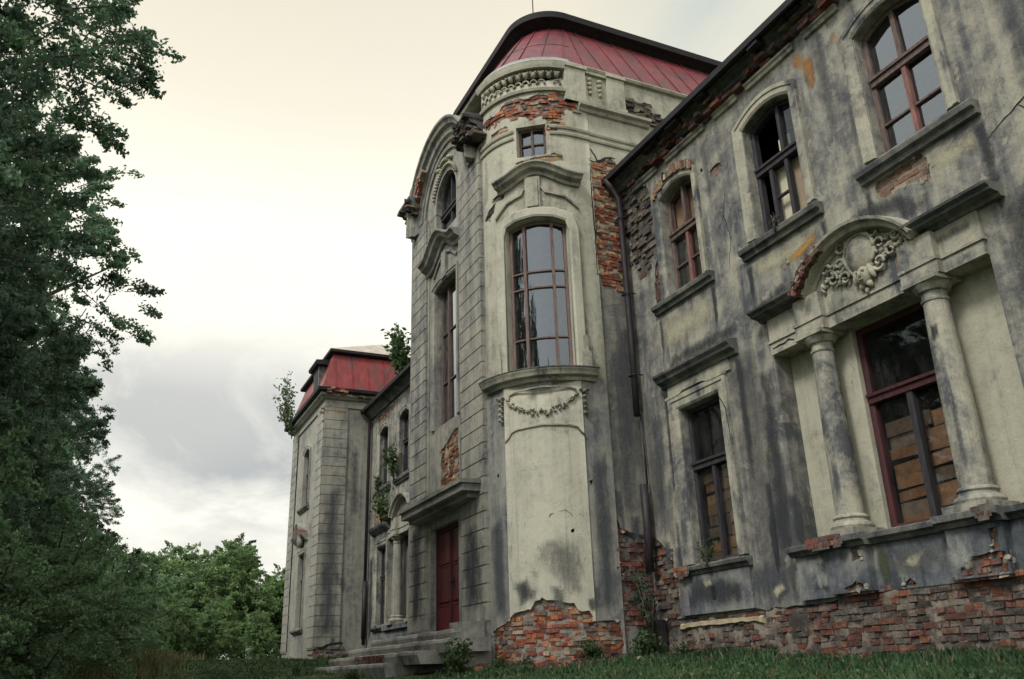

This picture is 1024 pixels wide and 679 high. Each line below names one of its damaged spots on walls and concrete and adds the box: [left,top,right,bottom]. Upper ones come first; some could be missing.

flaking render [483,91,582,139]
flaking render [625,97,663,128]
flaking render [877,134,973,198]
flaking render [588,158,662,303]
flaking render [439,428,460,487]
water stain [736,359,802,595]
water stain [321,492,344,645]
flaking render [491,528,690,665]
flaking render [805,533,863,561]
flaking render [844,581,876,596]
flaking render [961,503,1023,583]